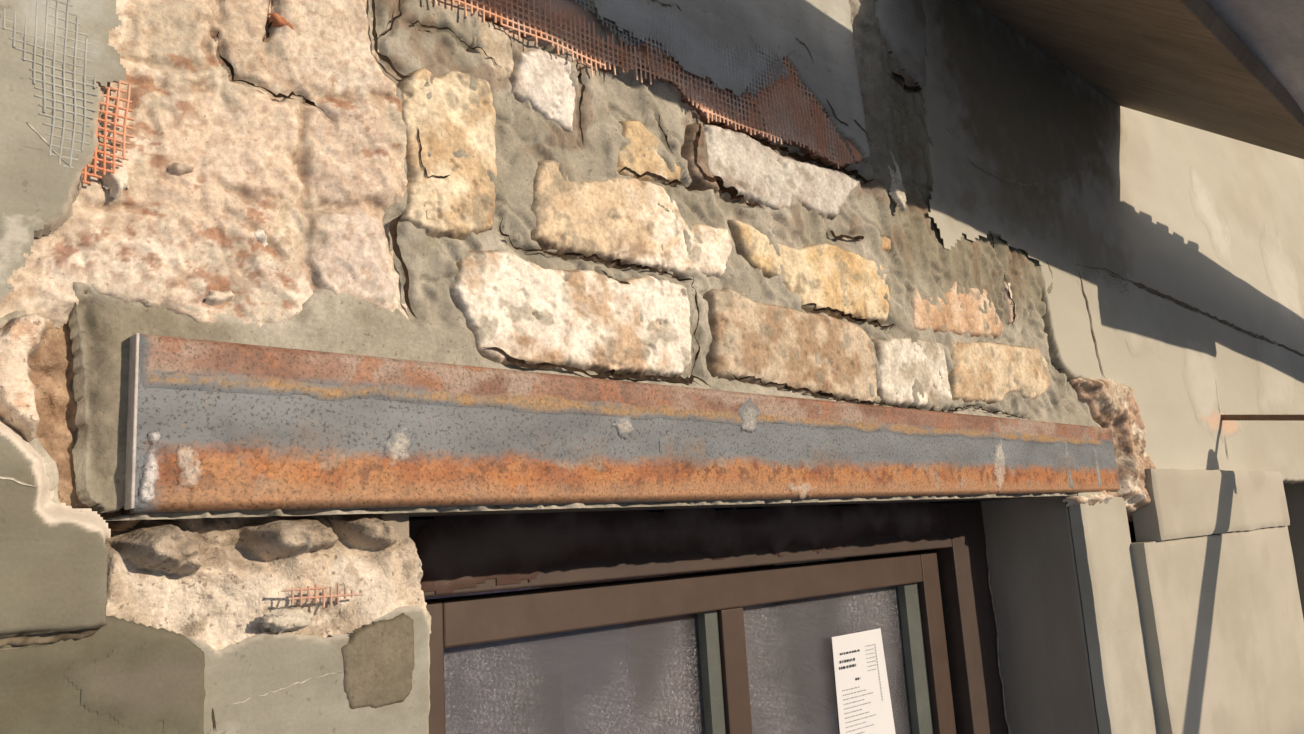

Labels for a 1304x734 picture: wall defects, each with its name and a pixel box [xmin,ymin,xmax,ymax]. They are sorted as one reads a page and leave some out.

spalling [888,150,907,213]
spalling [0,0,431,650]
crack [1076,264,1304,377]
crack [0,476,38,487]
rust [137,334,1120,512]
spalling [1063,378,1156,523]